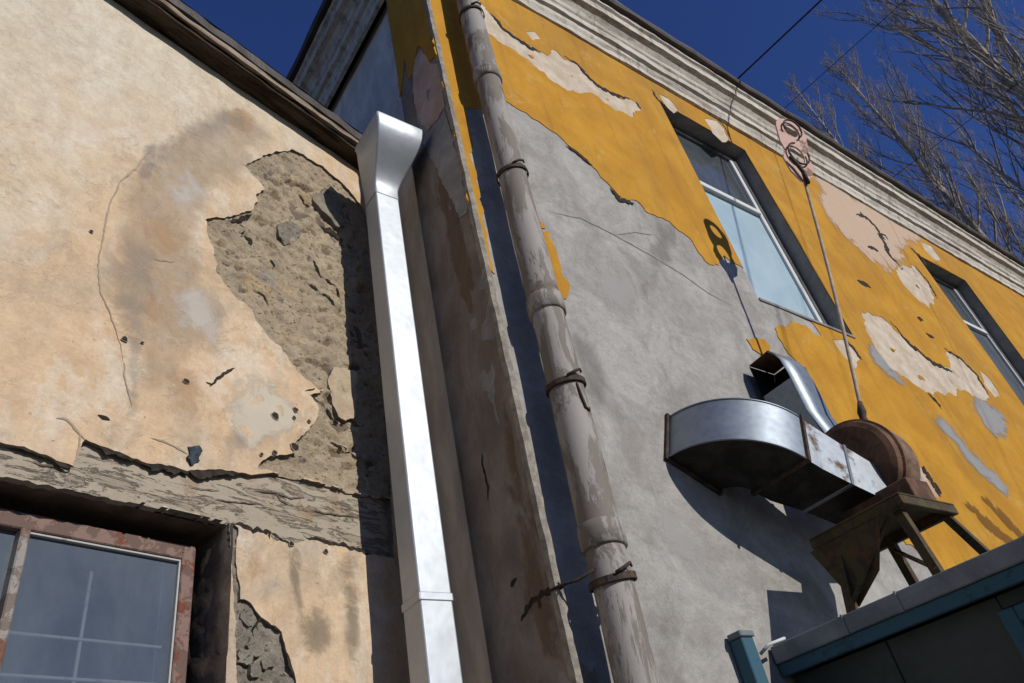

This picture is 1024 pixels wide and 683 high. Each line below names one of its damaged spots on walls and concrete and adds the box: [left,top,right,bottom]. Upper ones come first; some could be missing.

peeling [479,1,641,117]
peeling [705,119,731,142]
crack [98,146,154,404]
efflorescence [181,291,214,333]
crack [207,368,234,386]
spalling [206,151,390,500]
crack [553,212,725,302]
peeling [896,242,941,308]
peeling [862,312,1000,408]
crack [481,452,489,502]
peeling [920,466,942,497]
spalling [226,522,295,683]